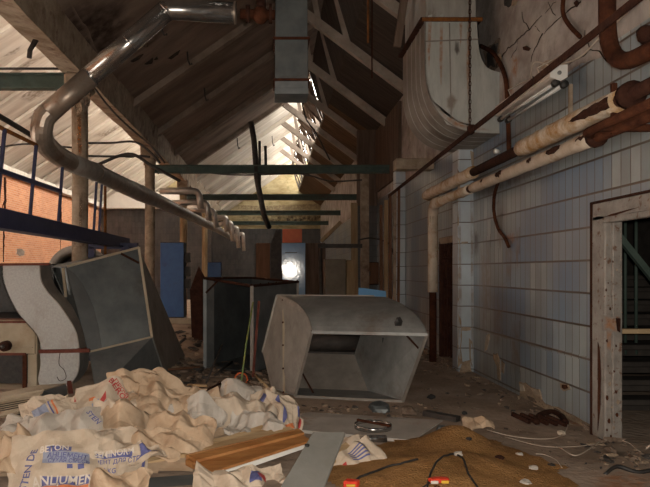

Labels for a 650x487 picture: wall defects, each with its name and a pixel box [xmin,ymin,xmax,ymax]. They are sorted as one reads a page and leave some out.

crack [502,1,581,60]
spalling [519,339,620,437]